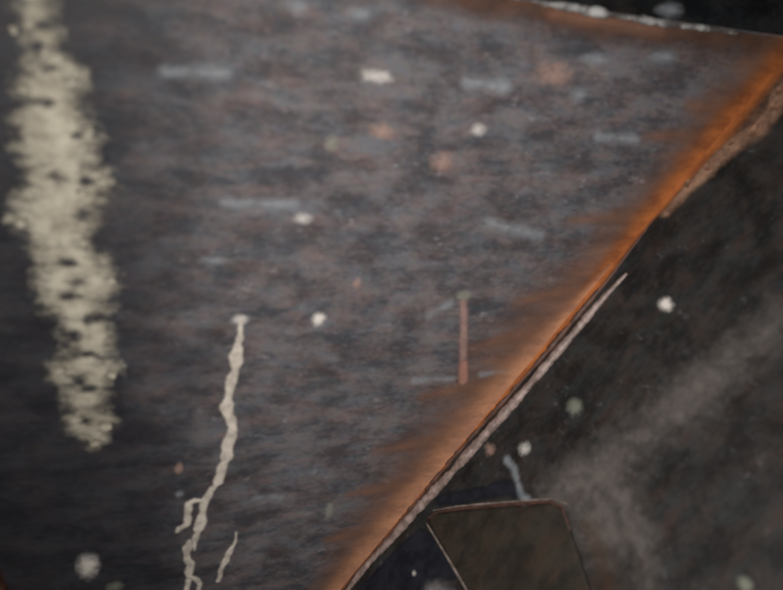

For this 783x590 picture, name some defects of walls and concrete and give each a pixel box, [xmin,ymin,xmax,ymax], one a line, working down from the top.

crack [176,317,244,590]
rust [324,0,783,590]